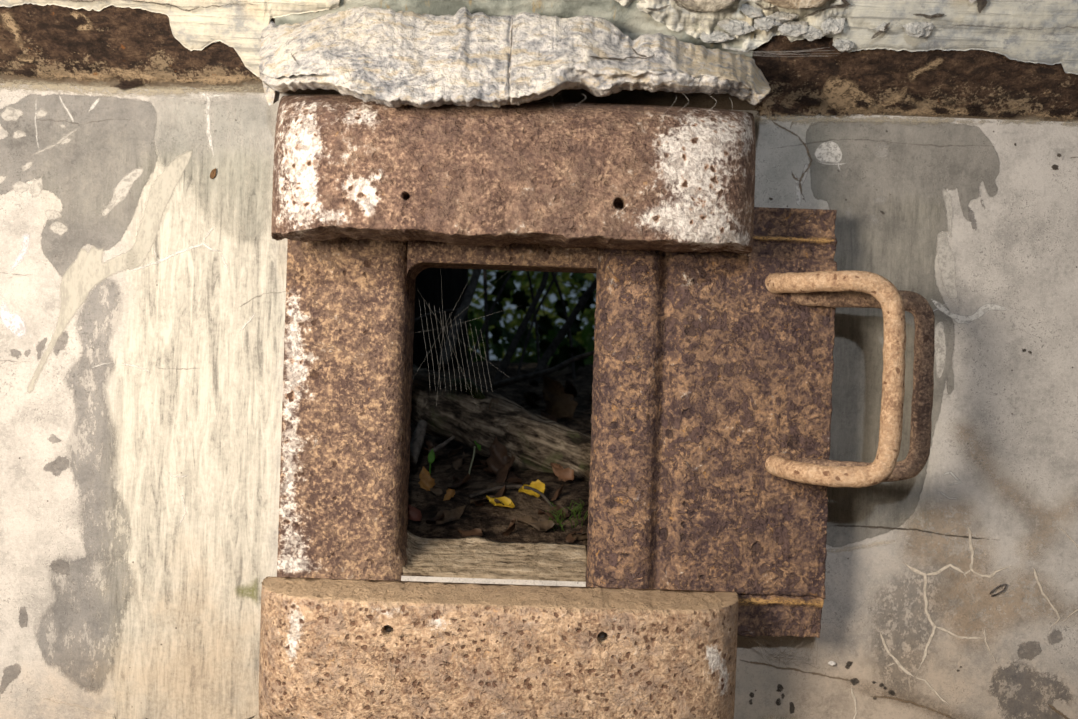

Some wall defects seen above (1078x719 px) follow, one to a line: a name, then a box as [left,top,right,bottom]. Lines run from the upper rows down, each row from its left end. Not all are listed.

spalling [0,0,1078,126]
water stain [0,94,272,277]
water stain [806,121,1005,463]
water stain [11,279,132,691]
water stain [826,460,928,547]
water stain [0,664,21,694]
crack [742,525,1008,719]
water stain [990,630,1071,719]
crack [1034,569,1078,625]